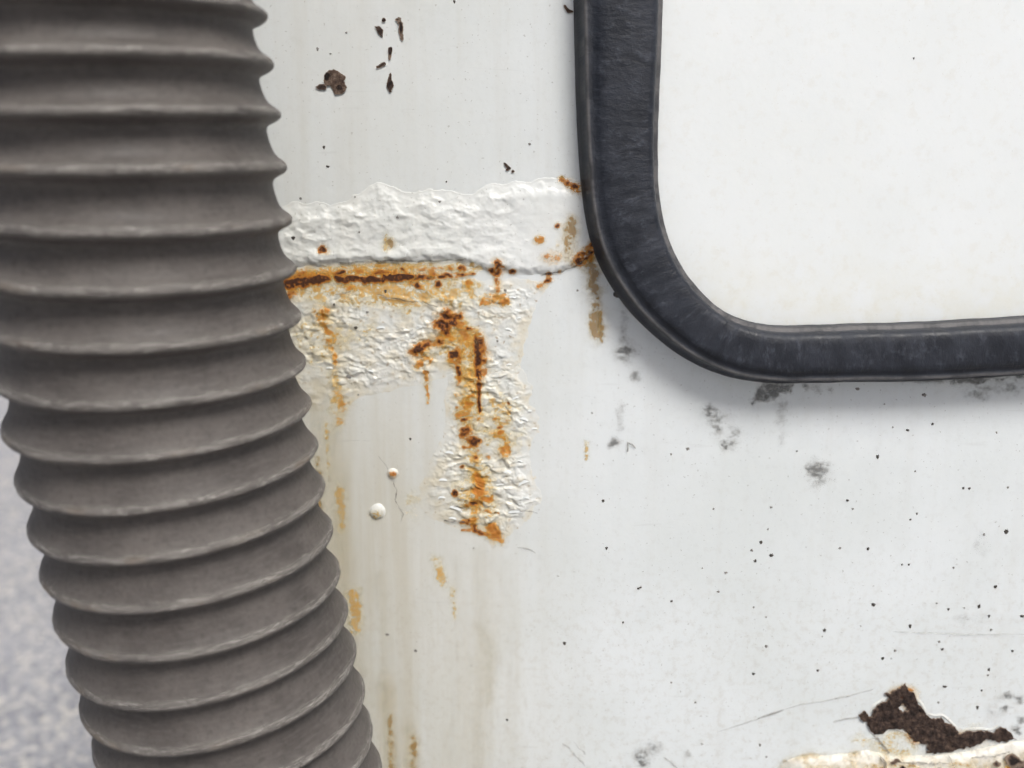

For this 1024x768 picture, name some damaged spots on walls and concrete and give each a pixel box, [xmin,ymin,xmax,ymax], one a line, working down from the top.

peeling [374,17,404,92]
peeling [316,69,347,95]
corrosion [559,176,581,193]
corrosion [534,217,604,343]
corrosion [287,258,516,544]
peeling [907,685,998,731]
peeling [869,729,925,746]